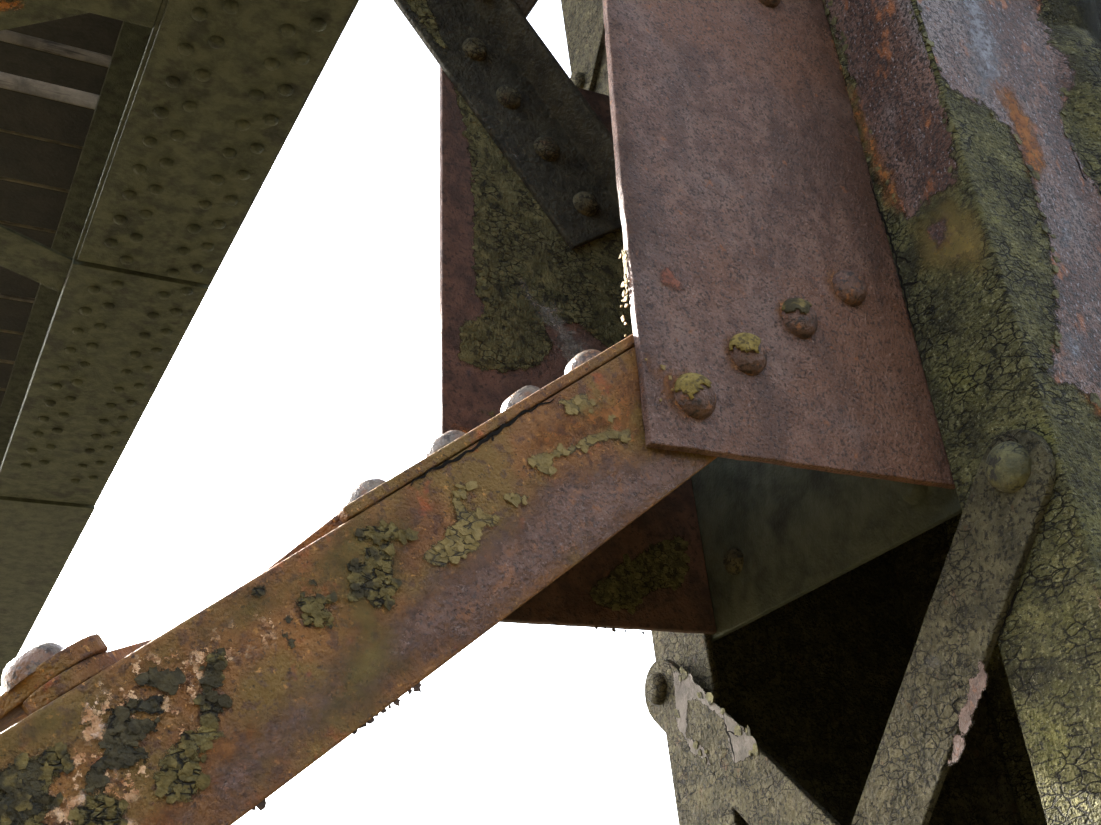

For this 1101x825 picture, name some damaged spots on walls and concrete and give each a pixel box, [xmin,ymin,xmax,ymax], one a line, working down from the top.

crack [998,571,1030,637]
peeling [673,667,759,765]
crack [945,698,975,734]